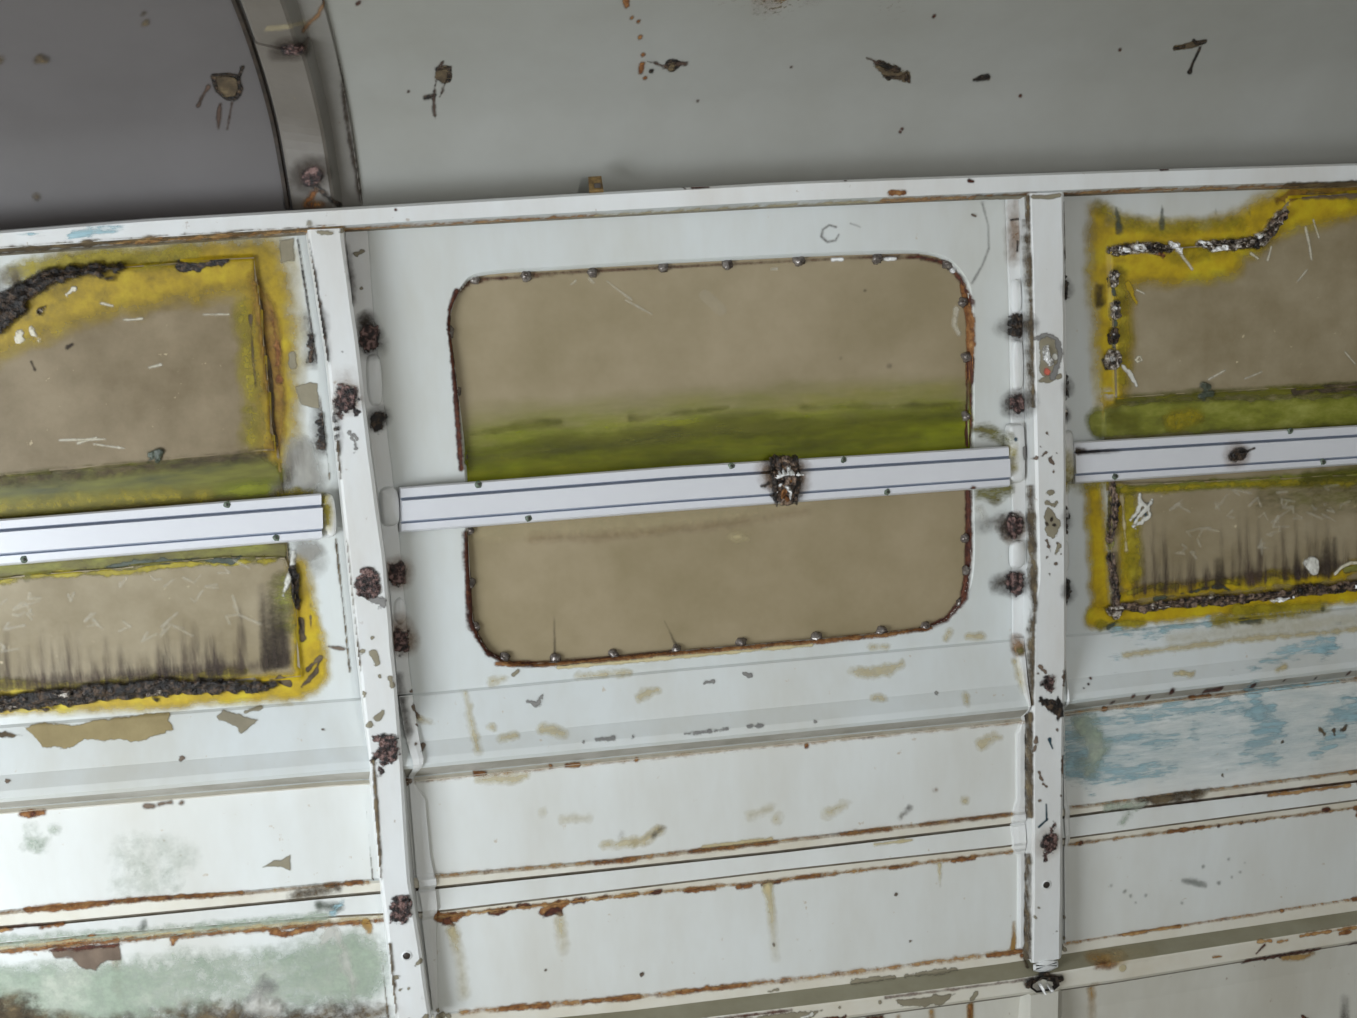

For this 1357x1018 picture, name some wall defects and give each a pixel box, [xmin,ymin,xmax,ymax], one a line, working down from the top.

rust [622,0,647,80]
peeling [0,712,173,749]
rust [0,891,384,954]
rust [273,880,369,898]
rust [434,851,1013,943]
water stain [0,902,382,1018]
rust [459,925,1024,1015]
peeling [757,1006,847,1018]
peeling [866,994,951,1018]